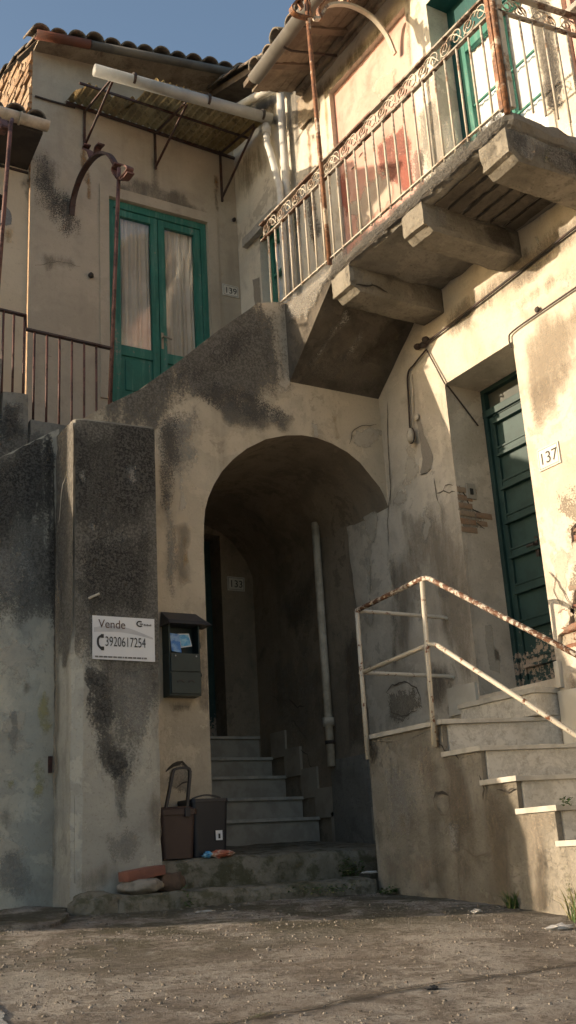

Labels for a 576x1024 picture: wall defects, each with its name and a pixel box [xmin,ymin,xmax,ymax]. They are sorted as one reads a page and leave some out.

water stain [527,0,562,111]
water stain [0,91,576,813]
flaking render [457,486,493,534]
peeling [549,489,576,648]